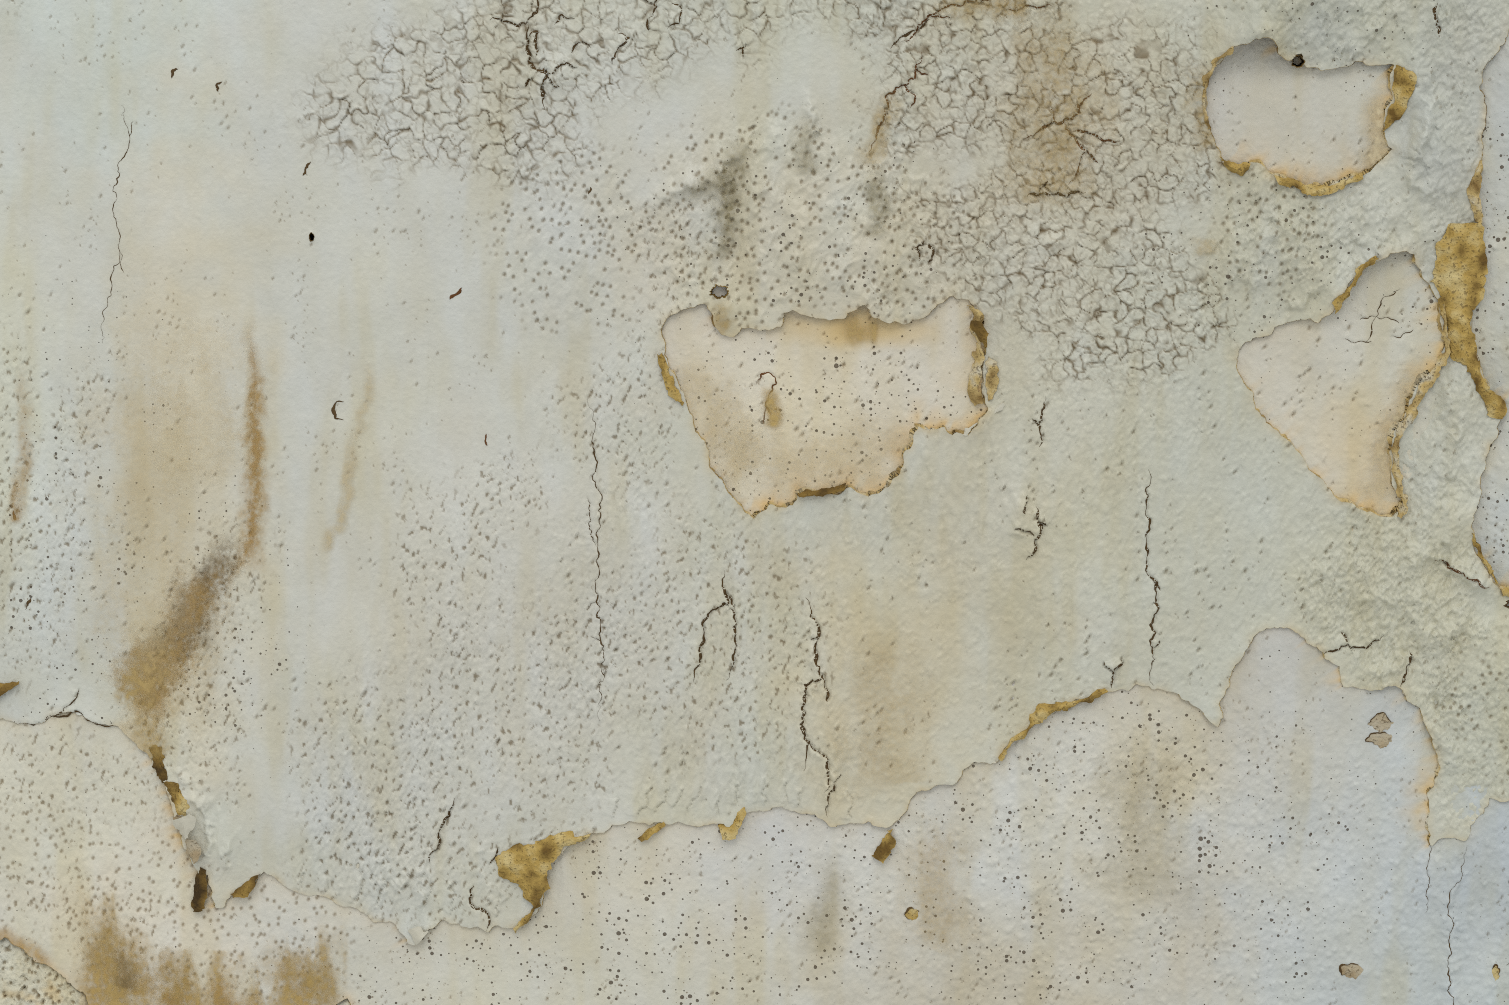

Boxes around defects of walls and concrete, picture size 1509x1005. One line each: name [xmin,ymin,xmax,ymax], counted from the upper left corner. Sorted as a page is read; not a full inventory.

crack [303,0,868,168]
crack [859,0,1225,373]
peeling [1202,37,1417,196]
peeling [1236,29,1509,606]
peeling [657,285,1005,519]
crack [19,690,113,727]
crack [800,598,841,815]
water stain [85,927,228,1005]
water stain [250,946,334,1005]
crack [428,798,455,862]
crack [469,849,498,928]
peeling [0,627,1509,1005]